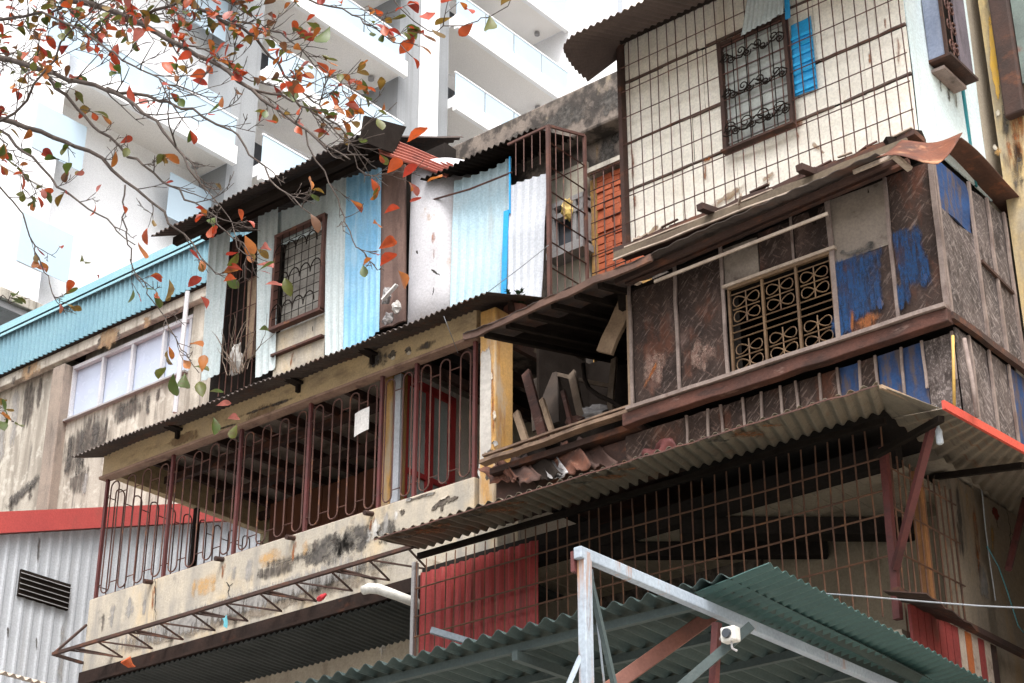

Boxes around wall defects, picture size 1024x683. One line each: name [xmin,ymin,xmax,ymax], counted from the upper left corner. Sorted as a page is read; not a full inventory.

damp [544,90,618,131]
damp [599,132,619,162]
corrosion [876,132,963,164]
corrosion [1002,100,1023,189]
peeling [832,247,884,336]
peeling [892,226,930,309]
damp [0,362,42,458]
damp [64,388,160,493]
peeling [478,348,498,480]
damp [6,476,39,511]
spalling [399,492,458,515]
damp [125,512,398,651]